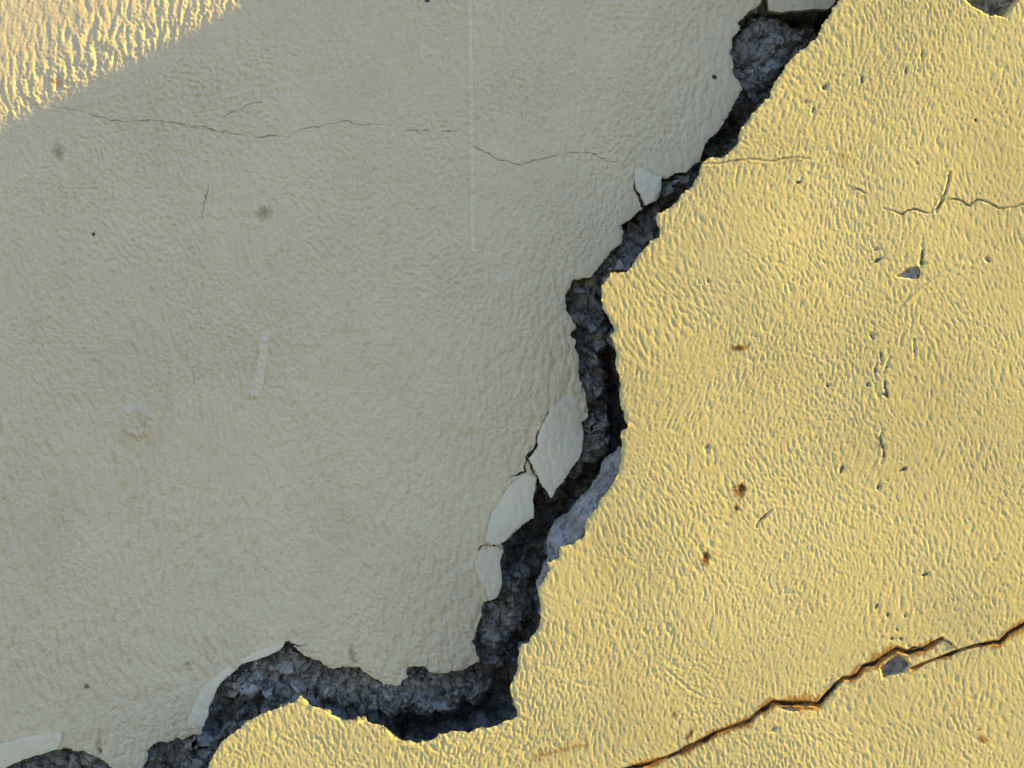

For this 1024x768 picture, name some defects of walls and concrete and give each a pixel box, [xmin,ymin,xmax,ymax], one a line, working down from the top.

crack [886,172,1021,215]
crack [143,0,839,768]
crack [0,732,112,768]
crack [627,622,1024,768]